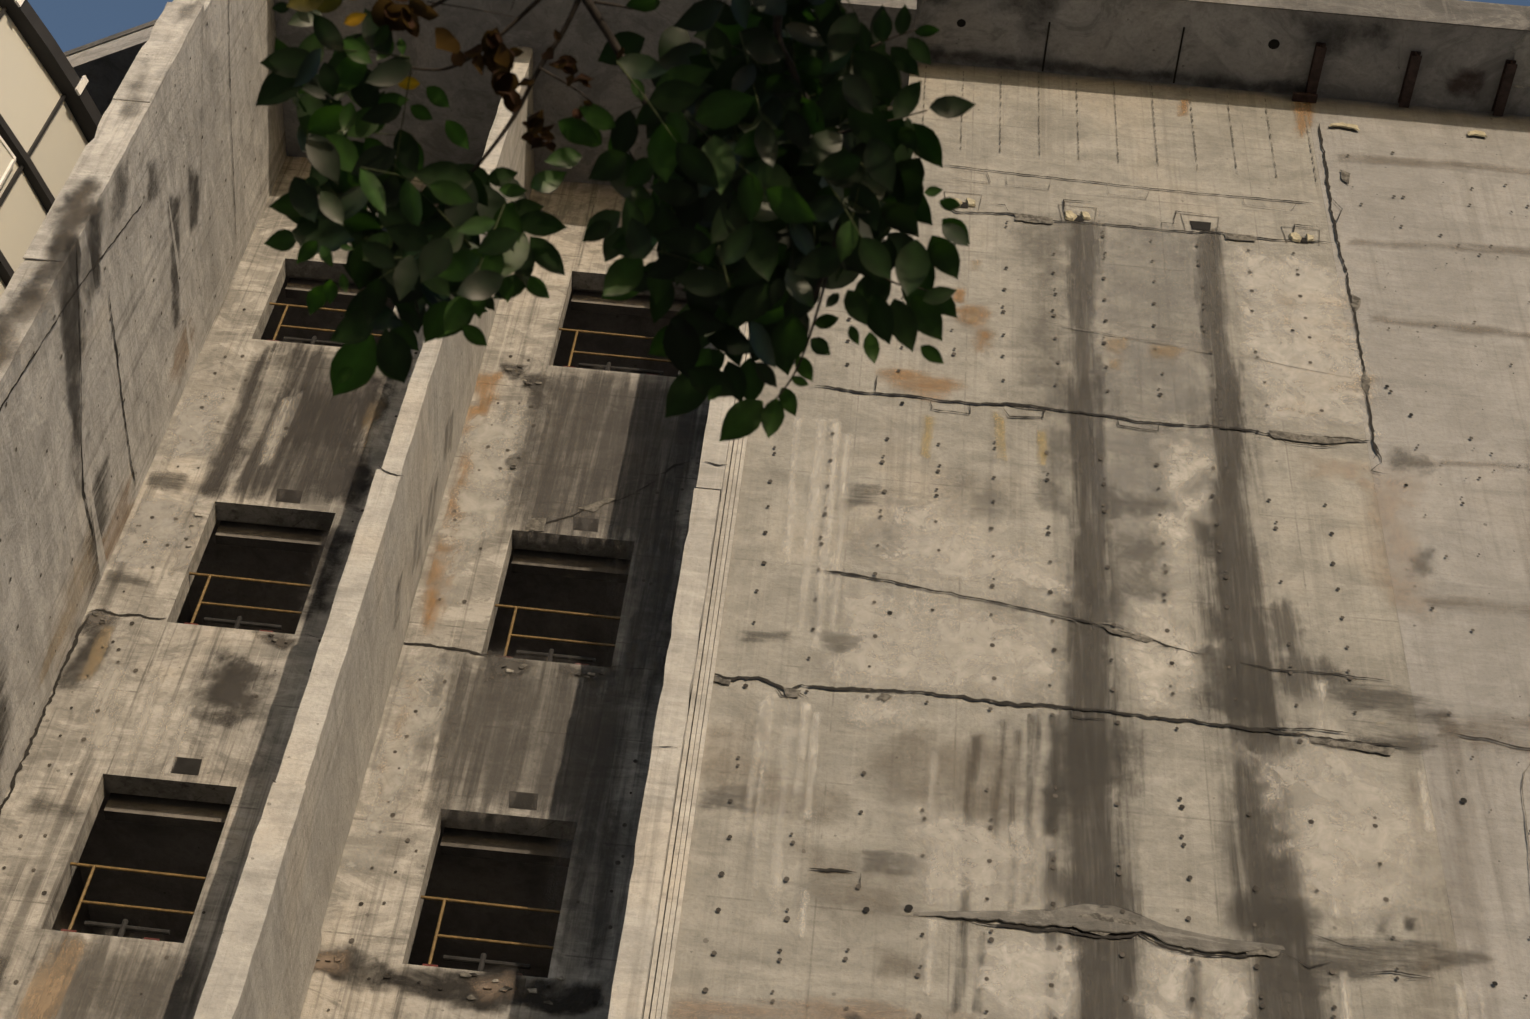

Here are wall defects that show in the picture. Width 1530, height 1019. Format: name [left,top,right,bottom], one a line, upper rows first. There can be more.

damp [0,179,100,444]
crack [815,123,1386,474]
damp [88,461,149,592]
damp [61,622,125,747]
damp [129,654,261,774]
crack [714,673,1407,755]
damp [993,222,1160,1019]
damp [1198,229,1488,1019]
crack [1449,732,1530,869]
crack [810,868,861,885]
spalling [313,949,603,1014]
crack [971,913,1431,979]